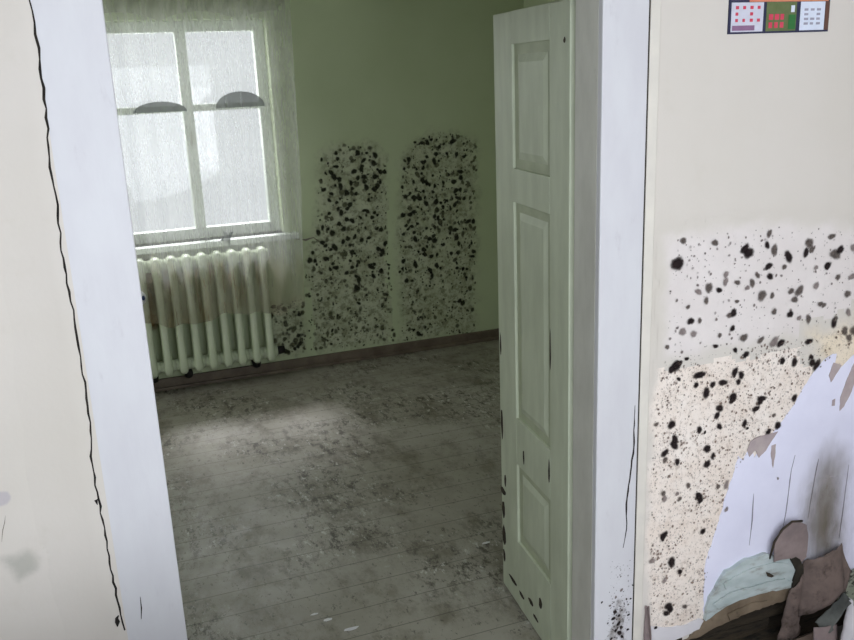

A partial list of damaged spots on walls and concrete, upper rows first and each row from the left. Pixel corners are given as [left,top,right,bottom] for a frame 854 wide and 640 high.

crack [29,0,142,631]
leakage [258,119,489,363]
crack [623,410,635,547]
leakage [601,208,854,640]
spalling [684,552,804,640]